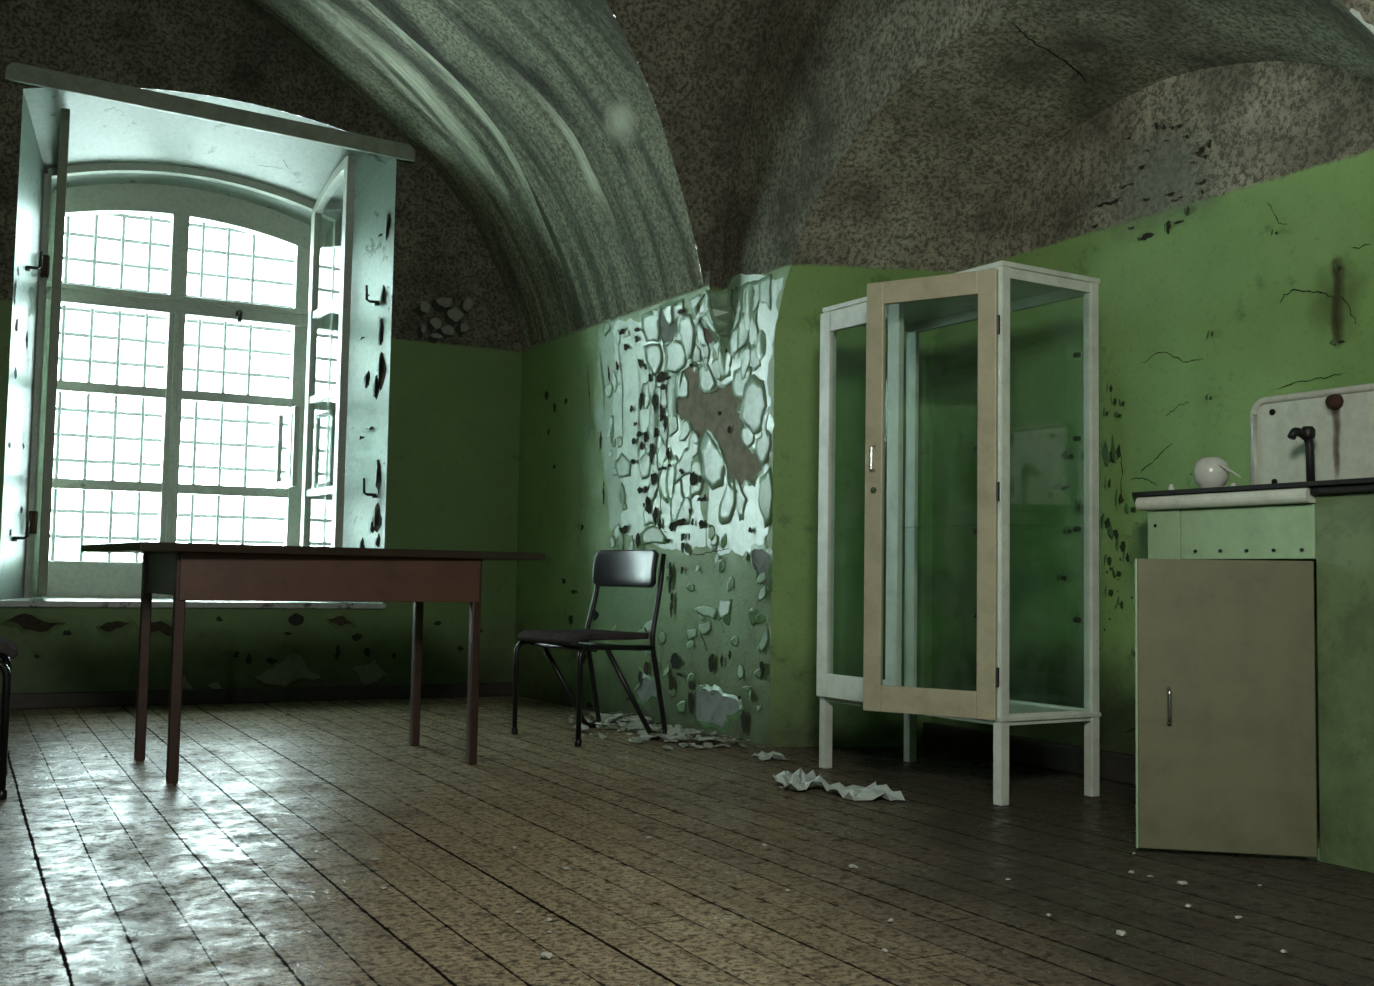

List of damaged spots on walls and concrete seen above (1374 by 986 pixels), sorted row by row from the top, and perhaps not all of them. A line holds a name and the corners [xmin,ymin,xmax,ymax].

spalling [1349,8,1374,34]
peeling [377,213,391,241]
peeling [359,285,387,399]
peeling [358,459,382,548]
peeling [594,273,783,733]